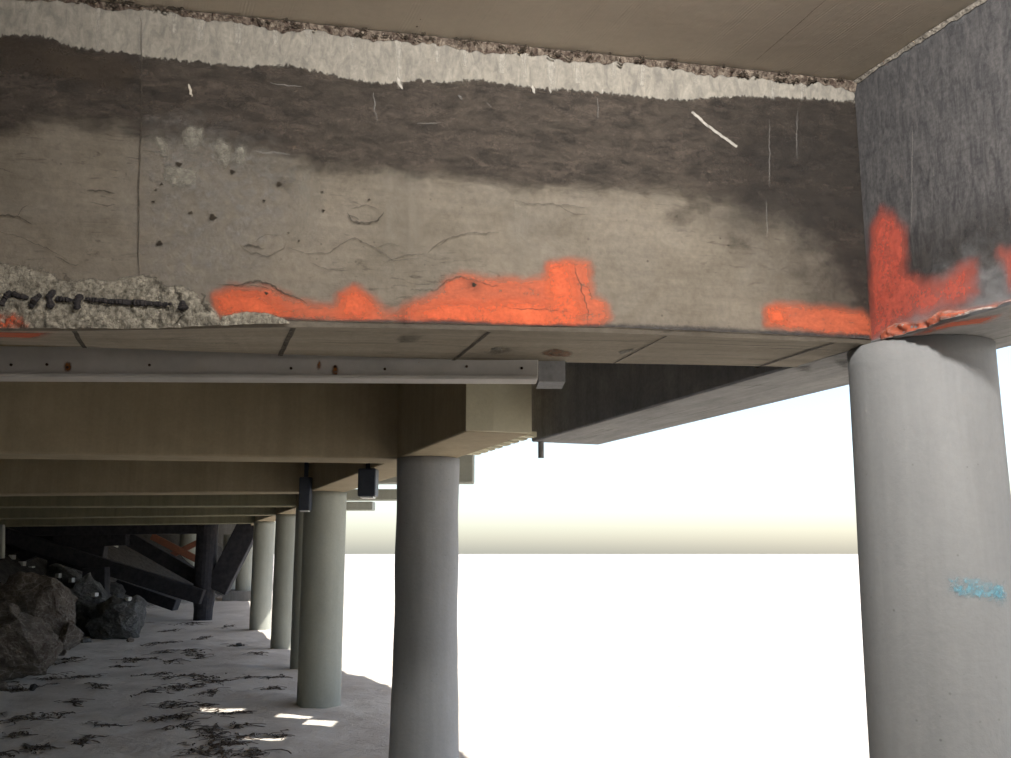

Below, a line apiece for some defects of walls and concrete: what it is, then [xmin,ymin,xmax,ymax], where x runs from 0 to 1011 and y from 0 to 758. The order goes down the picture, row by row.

peeling [152,137,198,203]
peeling [183,127,203,148]
peeling [215,140,245,174]
damp [0,0,1011,339]
crack [245,205,491,270]
spalling [0,263,290,329]
crack [219,280,307,304]